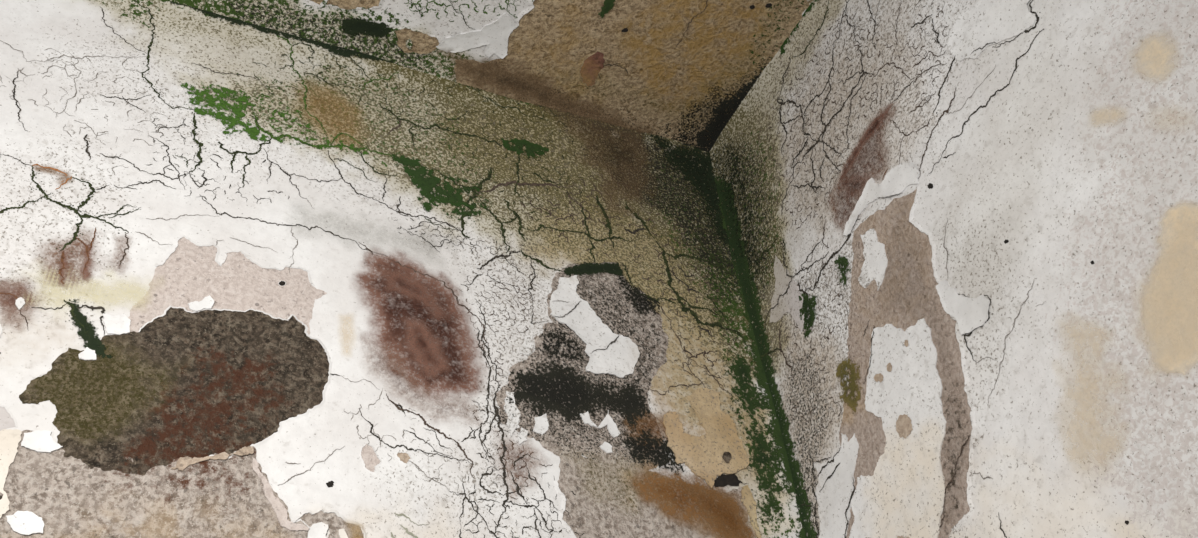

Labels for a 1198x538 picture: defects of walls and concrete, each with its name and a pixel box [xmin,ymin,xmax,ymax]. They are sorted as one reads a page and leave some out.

spalling [392,0,813,150]
spalling [0,235,368,538]
crack [0,0,753,538]
rust [357,255,479,406]
water stain [505,329,685,475]
water stain [457,59,763,282]
rust [830,106,893,229]
crack [752,0,1046,436]
spalling [839,162,990,538]
water stain [1143,204,1198,374]
rust [632,472,755,538]
crack [802,448,840,538]